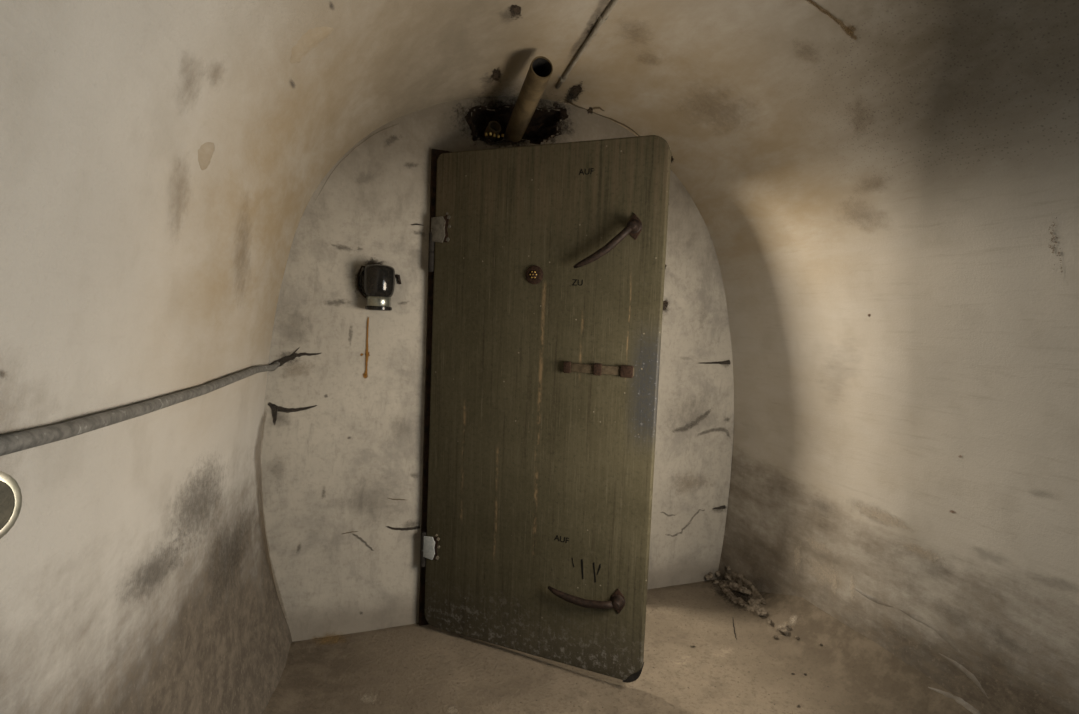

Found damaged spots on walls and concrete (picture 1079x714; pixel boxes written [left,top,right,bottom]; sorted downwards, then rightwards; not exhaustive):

crack [807,0,857,40]
spalling [466,85,583,145]
crack [269,348,321,371]
rust [360,317,370,378]
crack [268,402,317,425]